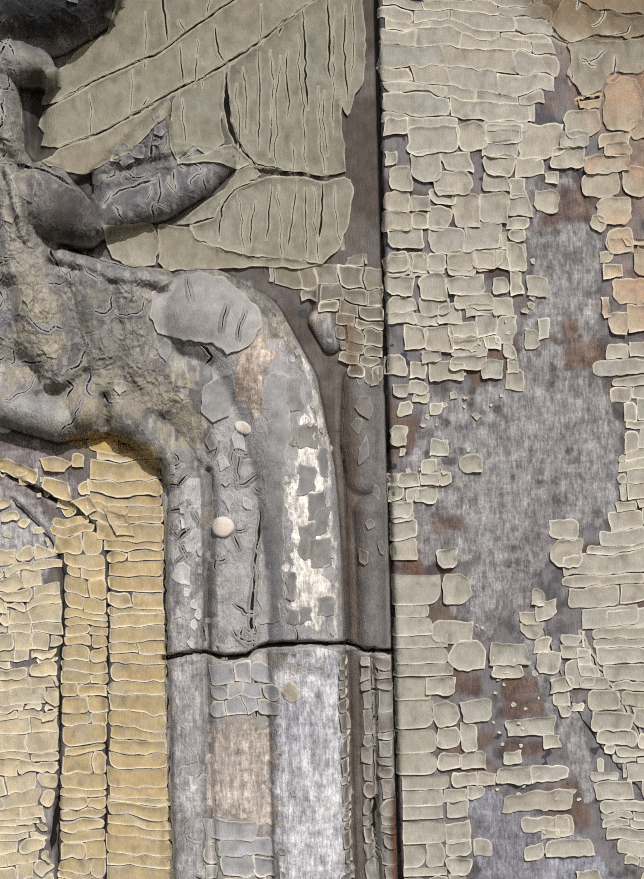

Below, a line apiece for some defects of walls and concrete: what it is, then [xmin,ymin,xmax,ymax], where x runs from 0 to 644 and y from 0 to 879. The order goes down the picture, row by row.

peeling [0,170,37,223]
crack [0,12,78,316]
crack [23,312,66,336]
crack [0,339,116,439]
crack [44,0,401,879]
peeling [38,0,408,625]
peeling [373,0,644,879]
crack [0,472,110,879]
peeling [360,657,377,879]